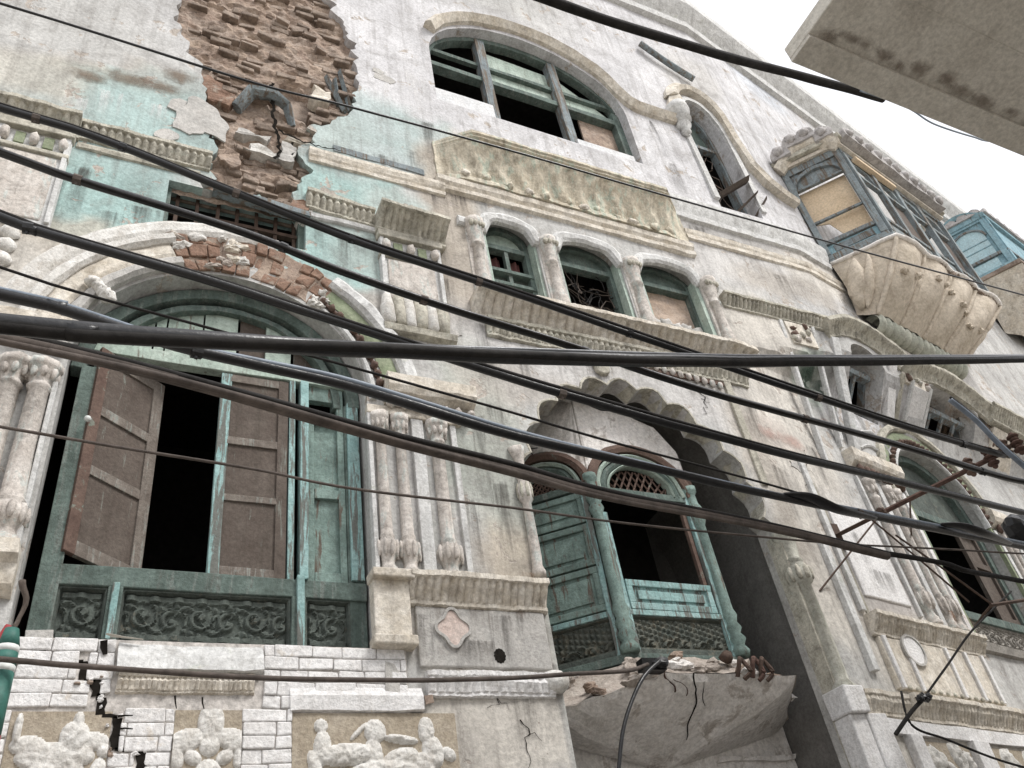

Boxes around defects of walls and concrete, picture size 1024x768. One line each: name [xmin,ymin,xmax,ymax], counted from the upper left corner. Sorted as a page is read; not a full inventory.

spalling [154,0,357,230]
crack [269,82,340,159]
flaking render [166,220,342,310]
crack [74,640,147,768]
crack [487,698,542,766]